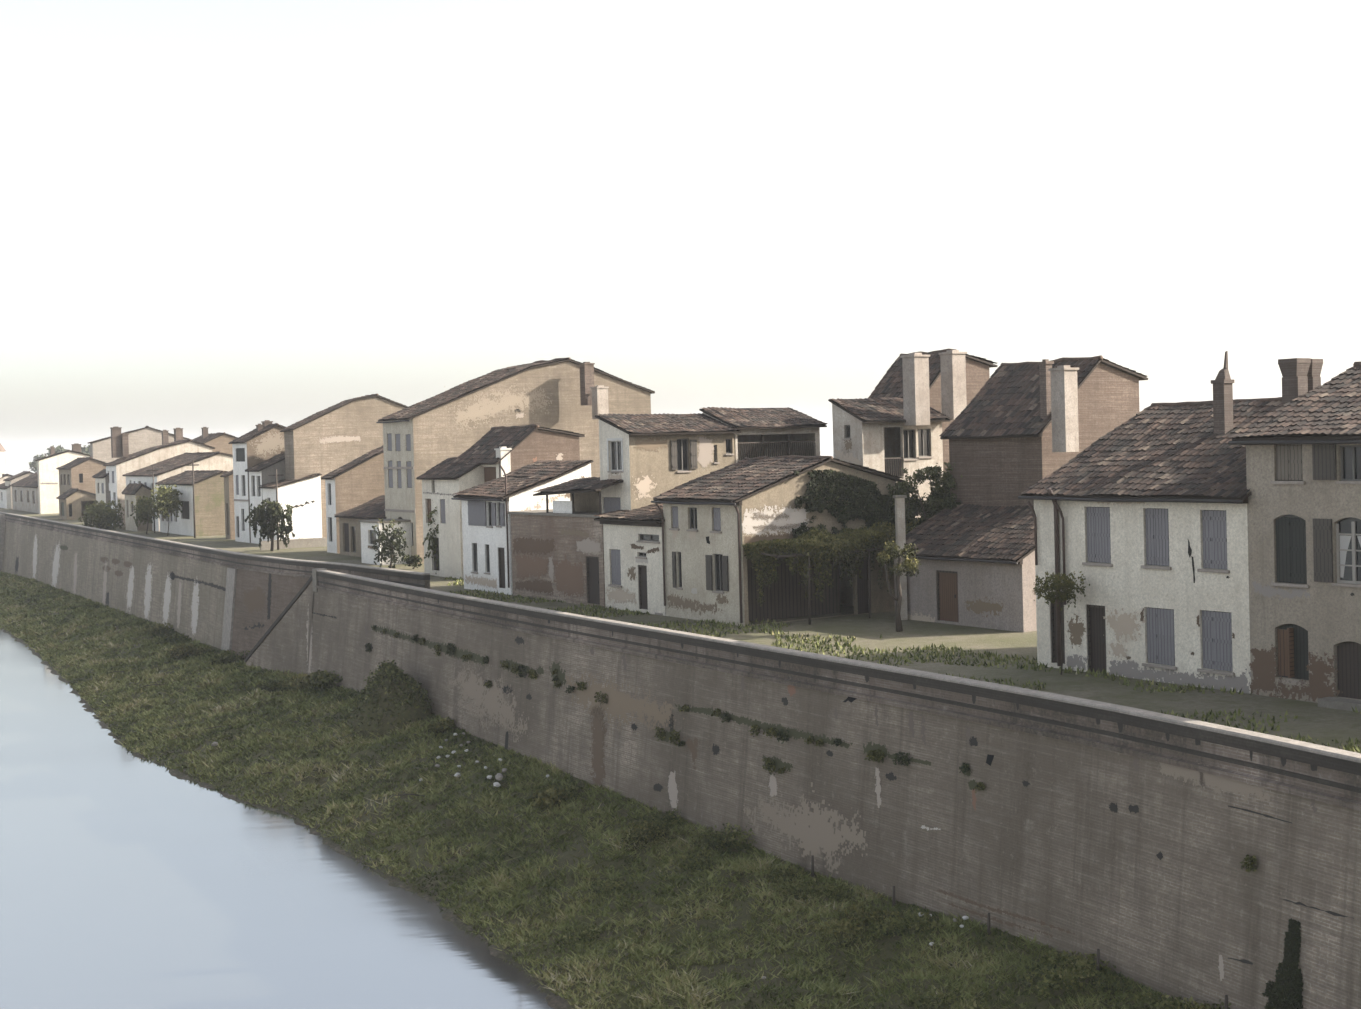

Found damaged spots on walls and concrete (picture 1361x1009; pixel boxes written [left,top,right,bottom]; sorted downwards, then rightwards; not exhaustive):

flaking render [1249,644,1343,702]
peeling [743,782,868,874]